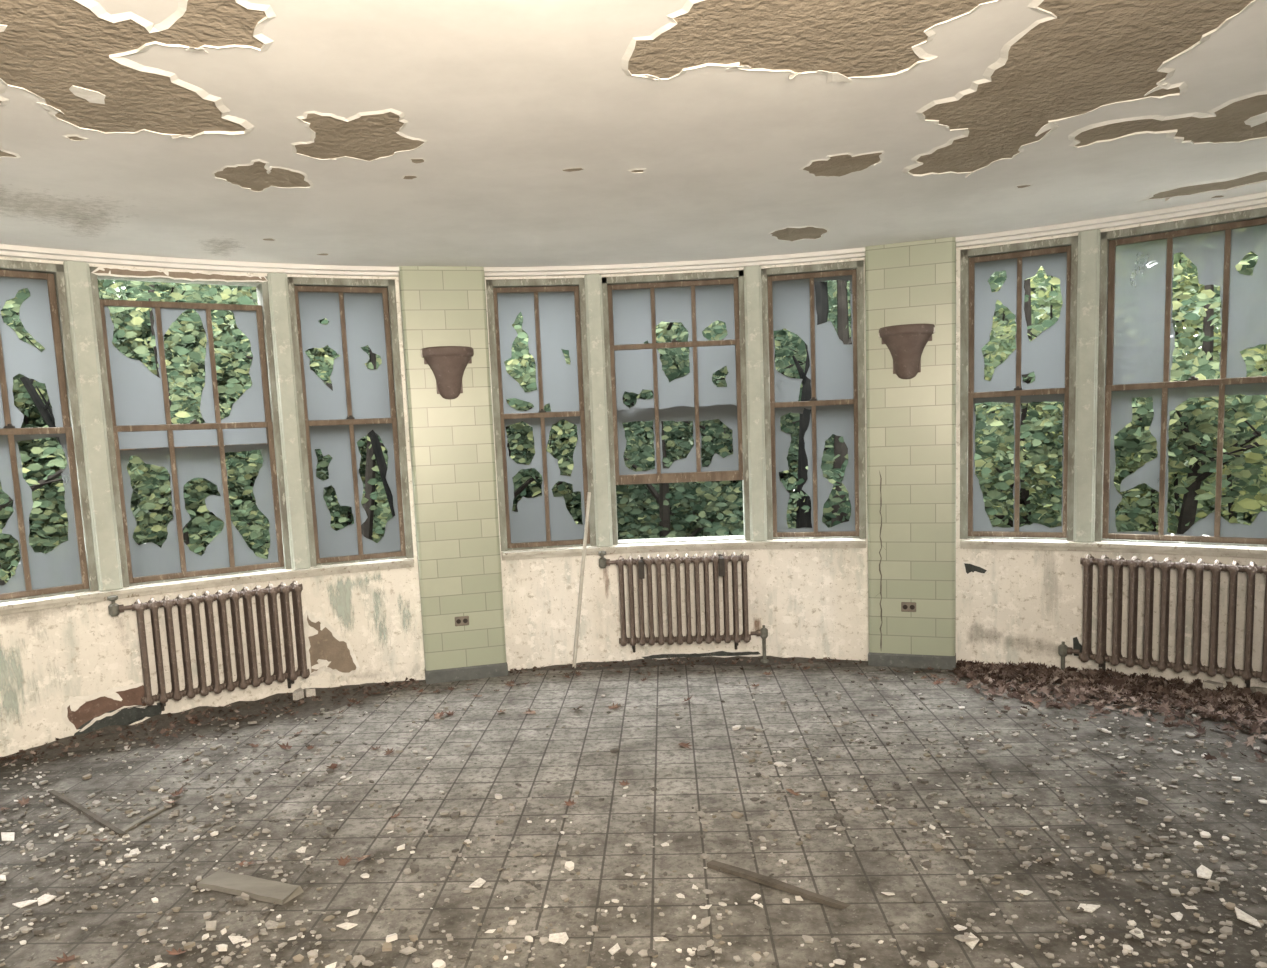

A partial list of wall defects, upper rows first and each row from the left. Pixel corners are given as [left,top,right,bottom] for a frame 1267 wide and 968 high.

peeling [621,0,1002,83]
peeling [0,0,277,141]
peeling [902,0,1267,177]
peeling [0,142,22,158]
peeling [212,159,314,192]
peeling [291,108,427,179]
peeling [800,151,885,177]
peeling [1136,168,1267,202]
peeling [768,225,830,242]
flaking render [303,610,360,677]
flaking render [62,682,162,735]